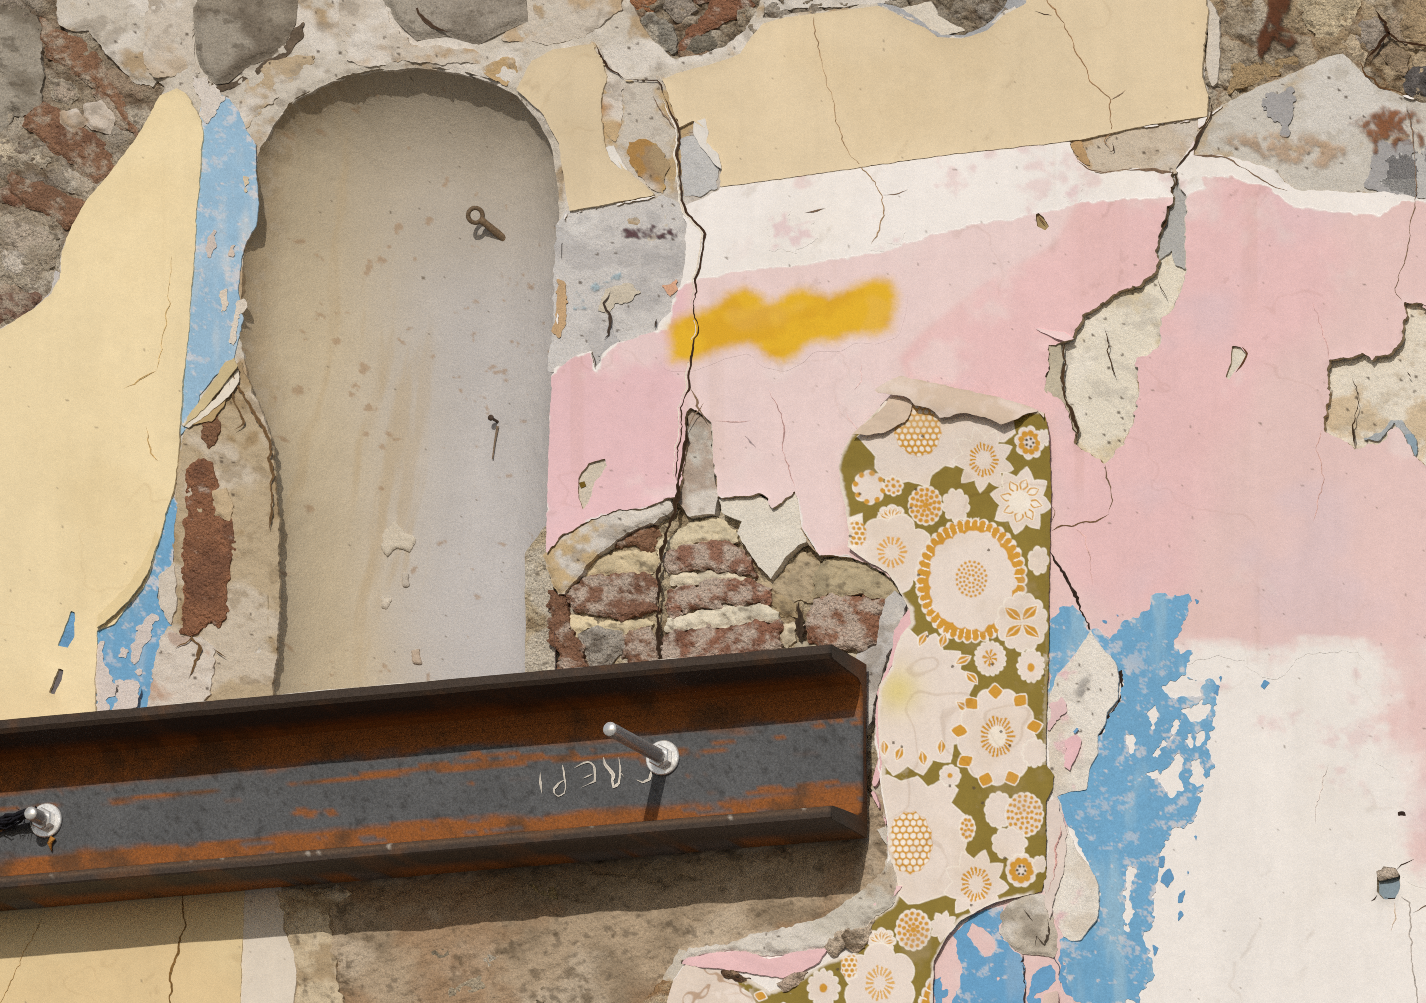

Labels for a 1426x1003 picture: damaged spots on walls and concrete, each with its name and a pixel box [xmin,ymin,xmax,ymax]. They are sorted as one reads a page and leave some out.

spalling [0,0,315,711]
crack [596,46,794,483]
crack [813,18,903,240]
flaking render [1037,0,1426,509]
crack [1395,110,1426,309]
crack [169,896,186,1003]
spalling [275,410,907,1003]
peeling [933,593,1222,1003]